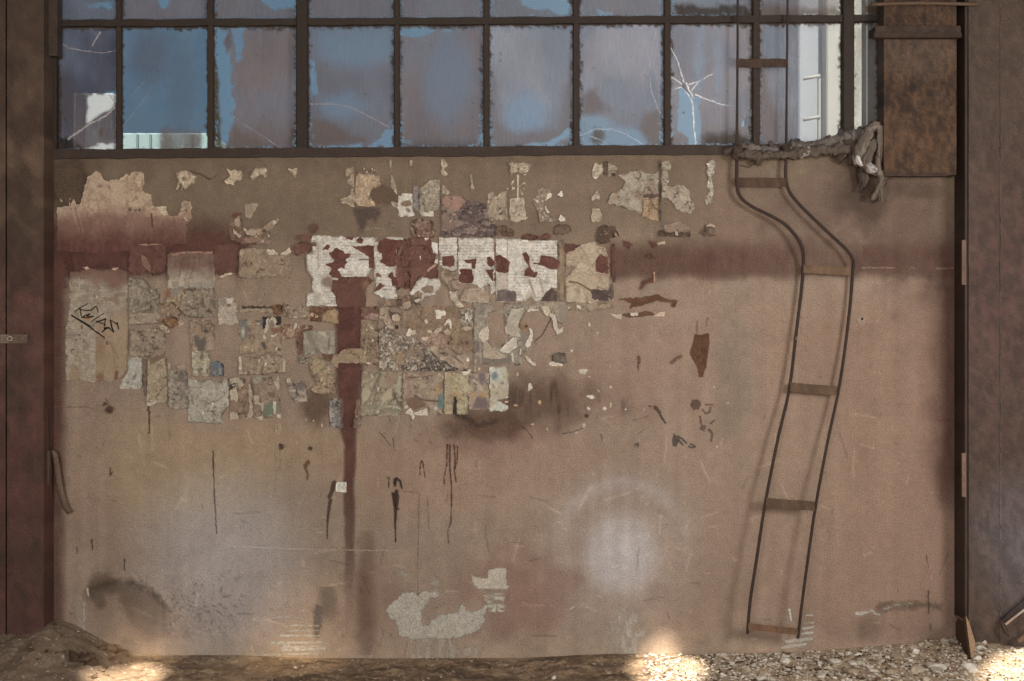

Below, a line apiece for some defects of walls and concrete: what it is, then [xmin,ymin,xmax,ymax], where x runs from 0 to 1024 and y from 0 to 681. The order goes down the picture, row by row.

peeling [56,170,196,254]
peeling [225,168,267,186]
peeling [229,203,279,248]
peeling [339,160,398,209]
peeling [440,159,450,196]
peeling [507,162,566,223]
peeling [591,163,618,237]
peeling [705,160,715,205]